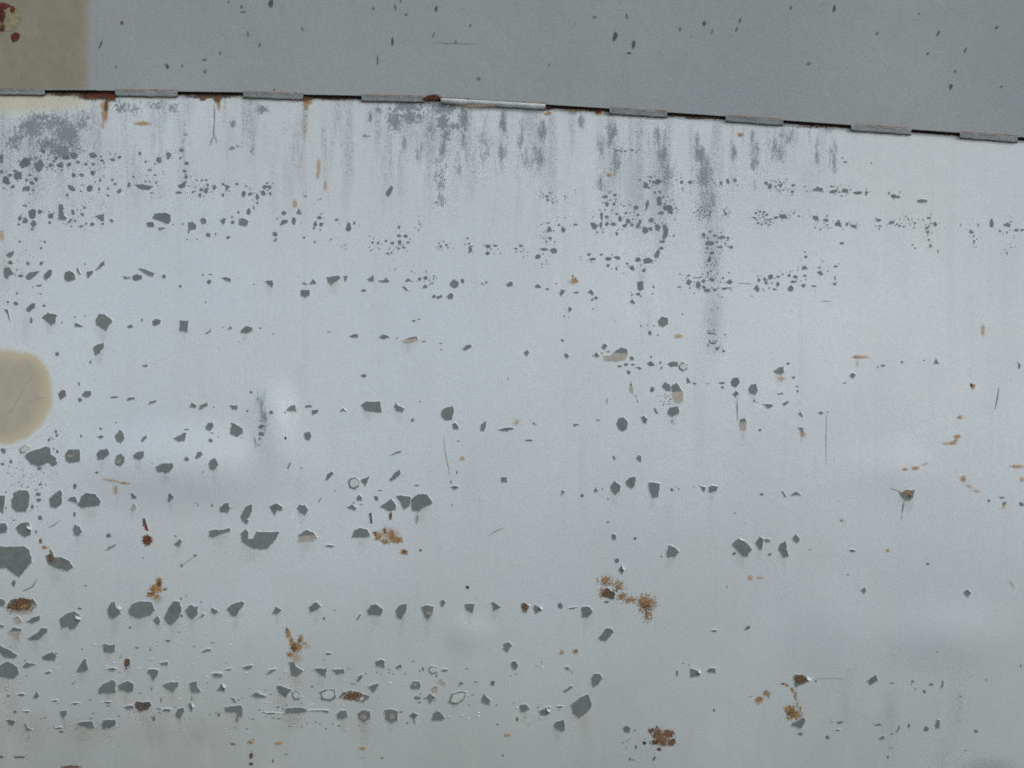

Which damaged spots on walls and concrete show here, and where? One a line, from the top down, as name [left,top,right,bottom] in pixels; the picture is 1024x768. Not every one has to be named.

corrosion [0,89,580,120]
peeling [0,149,274,231]
peeling [514,175,677,305]
peeling [592,343,805,436]
peeling [0,430,102,578]
peeling [345,476,433,539]
corrosion [373,528,408,555]
corrosion [147,578,168,599]
corrosion [597,575,659,623]
peeling [0,597,492,733]
corrosion [285,628,307,659]
corrosion [648,726,677,760]